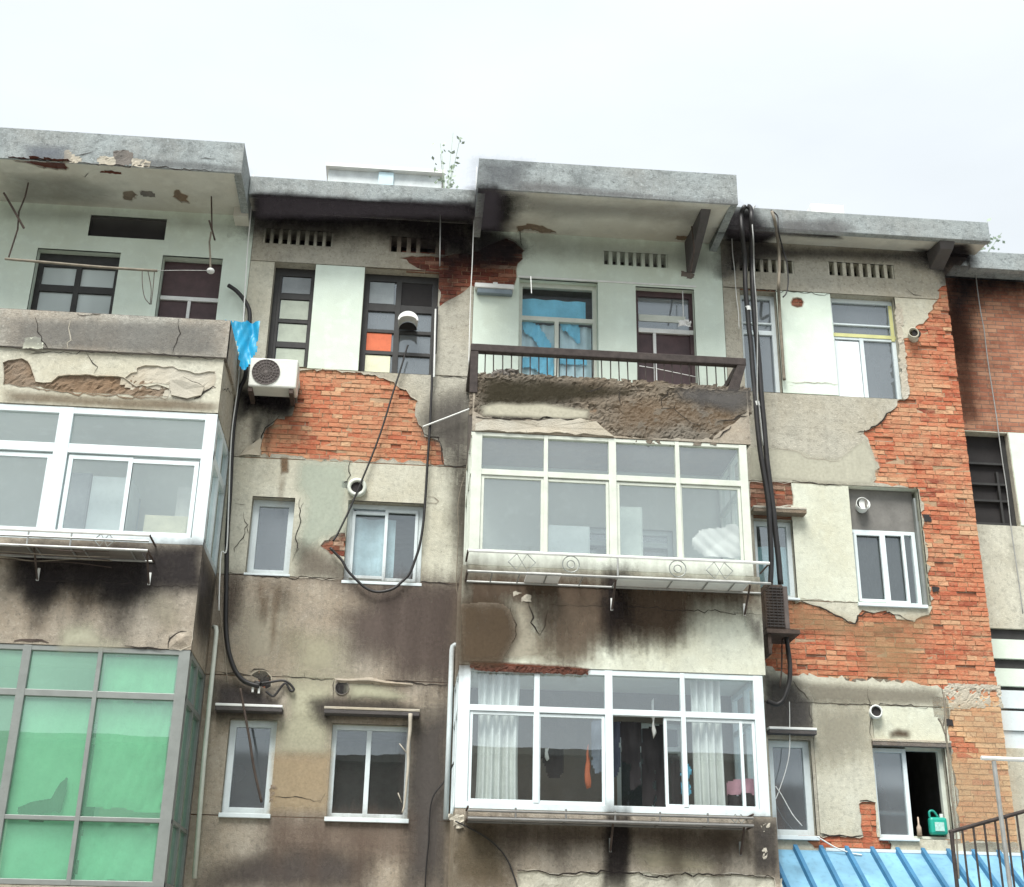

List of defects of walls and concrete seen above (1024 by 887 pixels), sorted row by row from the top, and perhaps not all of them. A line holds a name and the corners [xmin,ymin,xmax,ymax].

flaking render [10,150,82,171]
flaking render [400,223,556,306]
flaking render [2,336,216,401]
crack [12,314,232,399]
flaking render [240,368,465,468]
flaking render [469,372,752,446]
crack [230,500,341,580]
flaking render [738,286,1018,852]
damp [64,628,98,645]
damp [348,581,516,681]
damp [537,608,598,659]
crack [510,602,755,644]